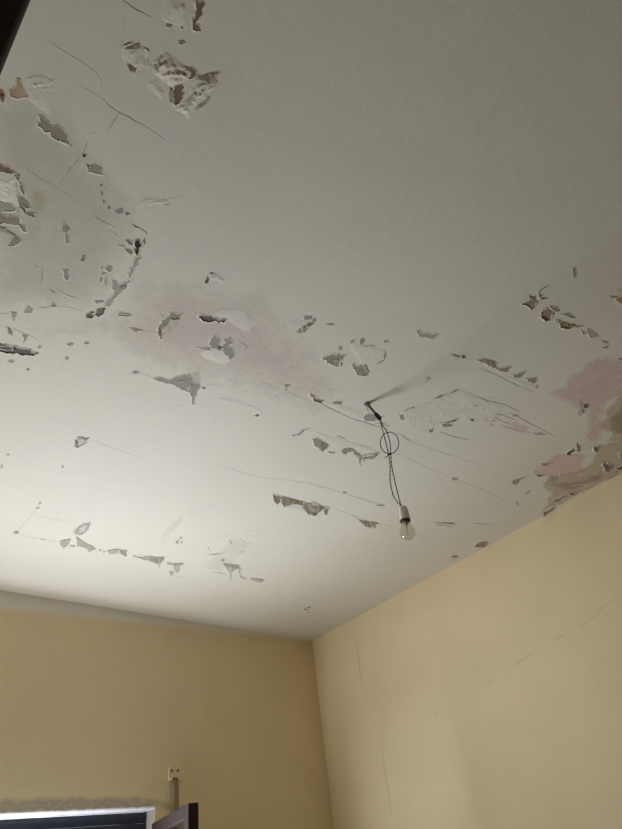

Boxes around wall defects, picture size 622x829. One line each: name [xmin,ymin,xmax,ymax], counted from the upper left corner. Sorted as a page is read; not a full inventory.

peeling [0,74,72,147]
crack [24,41,165,204]
peeling [121,42,218,119]
peeling [0,163,36,247]
crack [93,216,148,237]
peeling [0,238,145,363]
peeling [520,285,610,349]
peeling [128,370,224,406]
peeling [320,338,389,377]
leakage [537,361,622,509]
peeling [272,493,395,529]
peeling [60,522,184,578]